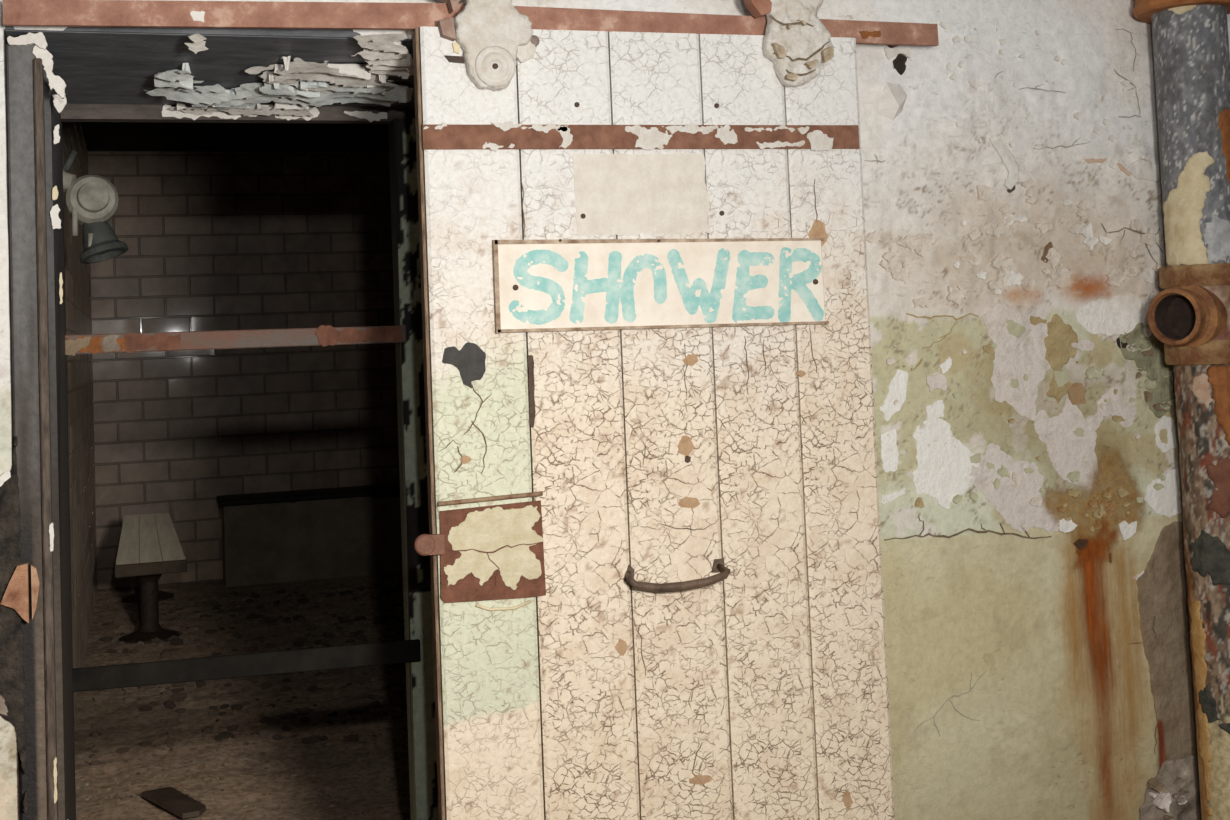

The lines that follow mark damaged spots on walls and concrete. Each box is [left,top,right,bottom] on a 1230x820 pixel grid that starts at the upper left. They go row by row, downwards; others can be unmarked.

corrosion [190,11,205,22]
peeling [144,33,414,122]
peeling [442,342,486,388]
spalling [879,105,1202,820]
corrosion [1191,364,1230,518]
spalling [0,436,27,774]
crack [451,542,541,586]
crack [662,520,718,531]
crack [884,516,1052,541]
corrosion [1072,523,1116,694]
corrosion [1190,600,1213,816]
crack [692,742,706,788]